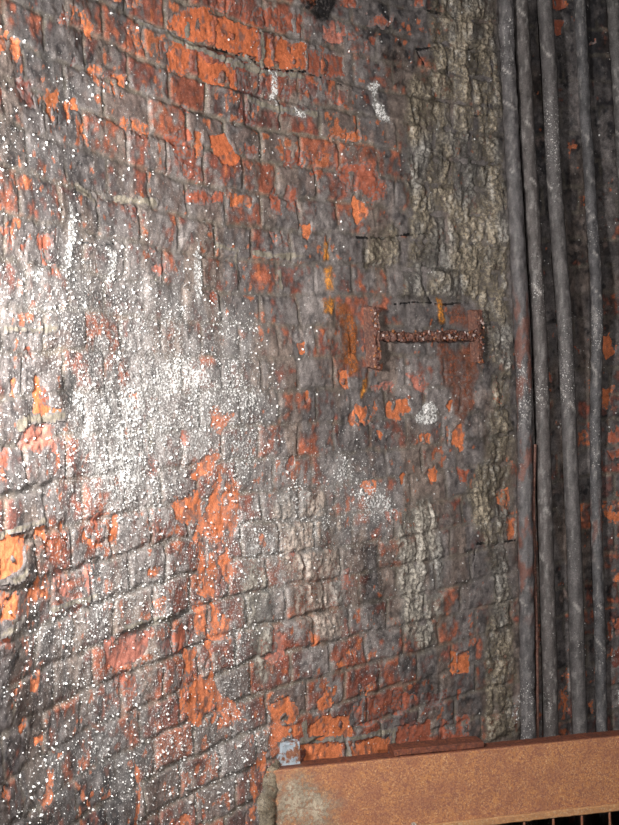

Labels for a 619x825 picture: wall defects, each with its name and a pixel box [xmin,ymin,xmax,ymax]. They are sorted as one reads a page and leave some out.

spalling [158,0,394,127]
corrosion [324,242,333,289]
corrosion [324,299,358,375]
water stain [363,0,520,741]
spalling [139,419,158,477]
water stain [8,205,443,825]
spalling [0,525,95,628]
spalling [160,453,247,732]
spalling [13,666,41,702]
spalling [103,627,153,692]
spalling [450,650,470,675]
spalling [244,681,470,825]